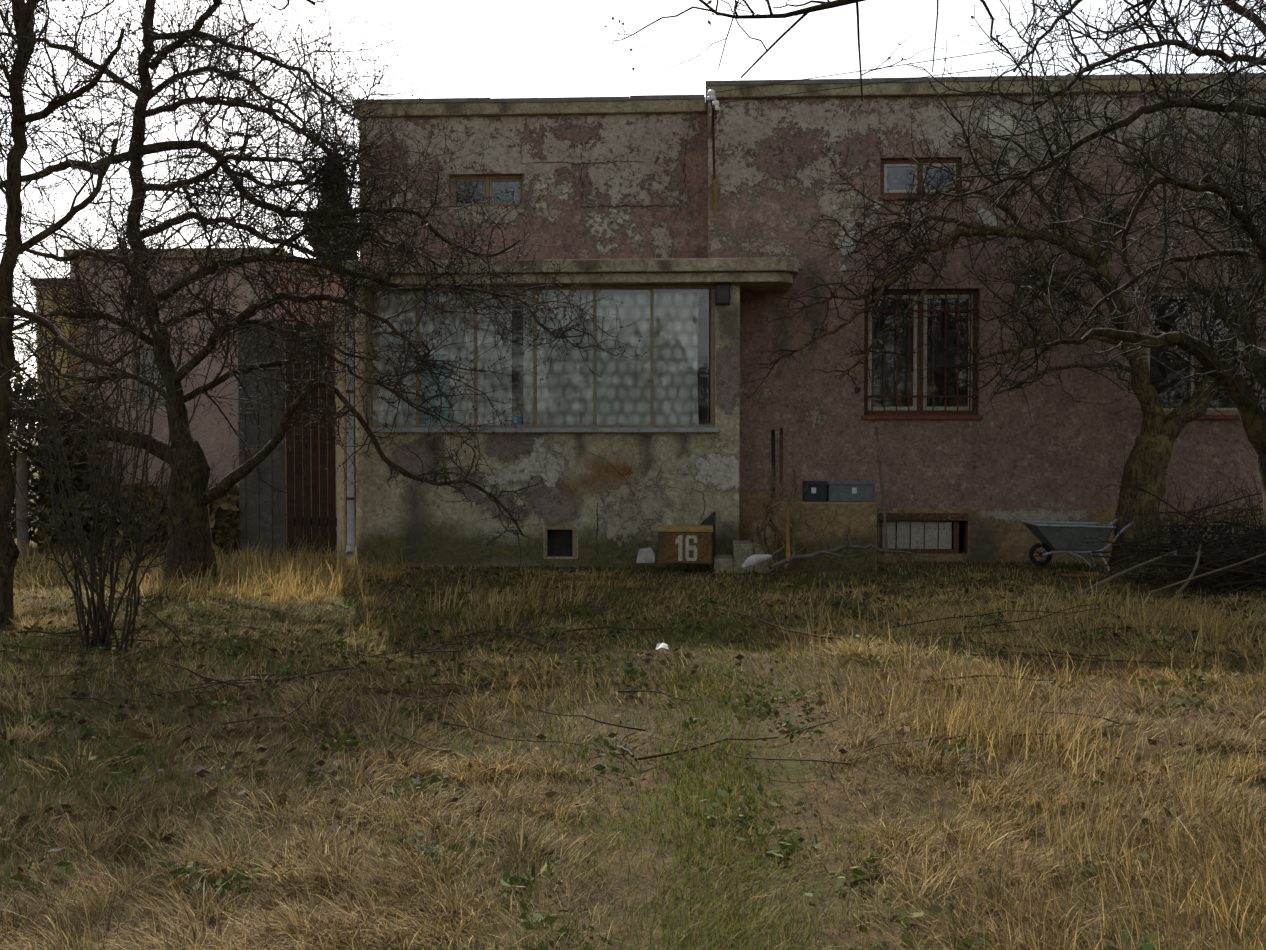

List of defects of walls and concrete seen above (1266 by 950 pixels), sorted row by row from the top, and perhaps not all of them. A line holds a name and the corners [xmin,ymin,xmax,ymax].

peeling [359,91,1266,273]
peeling [476,436,569,500]
peeling [589,437,739,553]